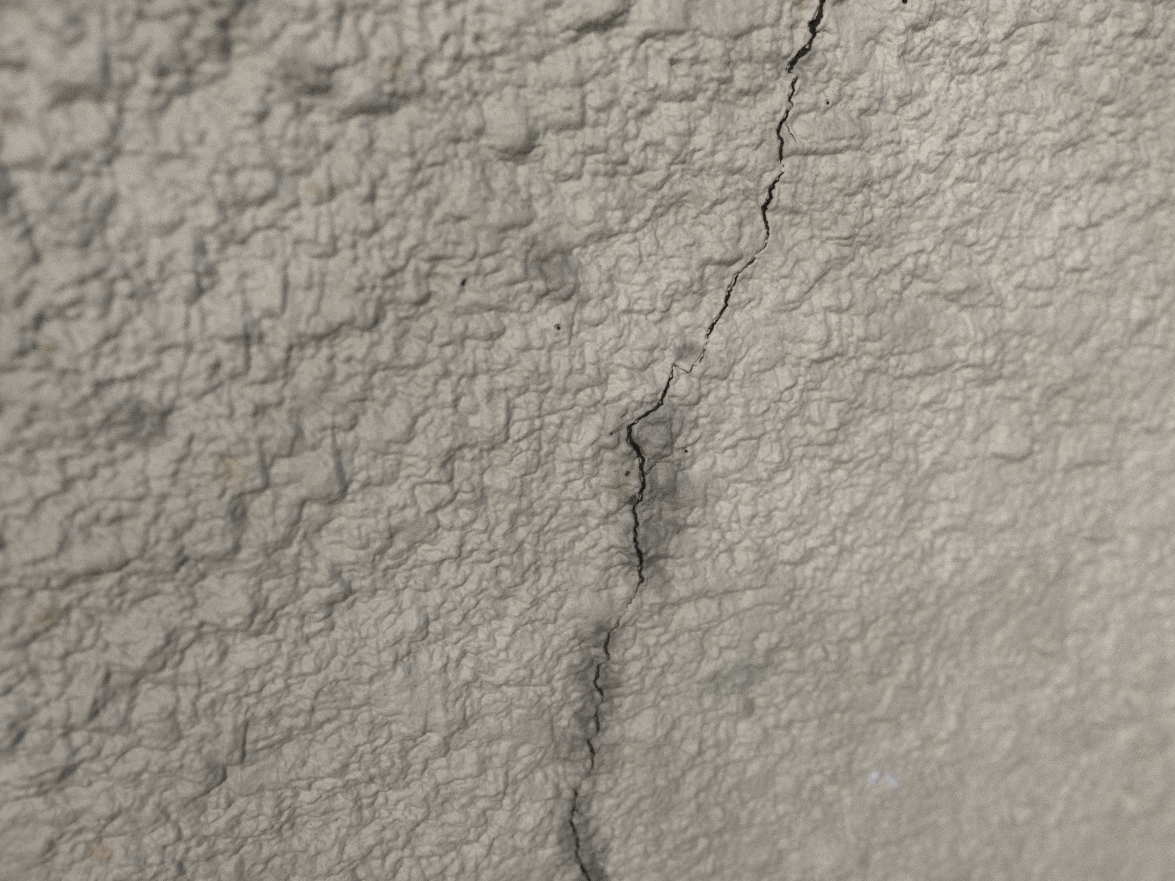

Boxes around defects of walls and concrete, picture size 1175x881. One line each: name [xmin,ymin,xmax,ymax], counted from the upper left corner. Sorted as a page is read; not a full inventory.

crack [570,0,830,881]